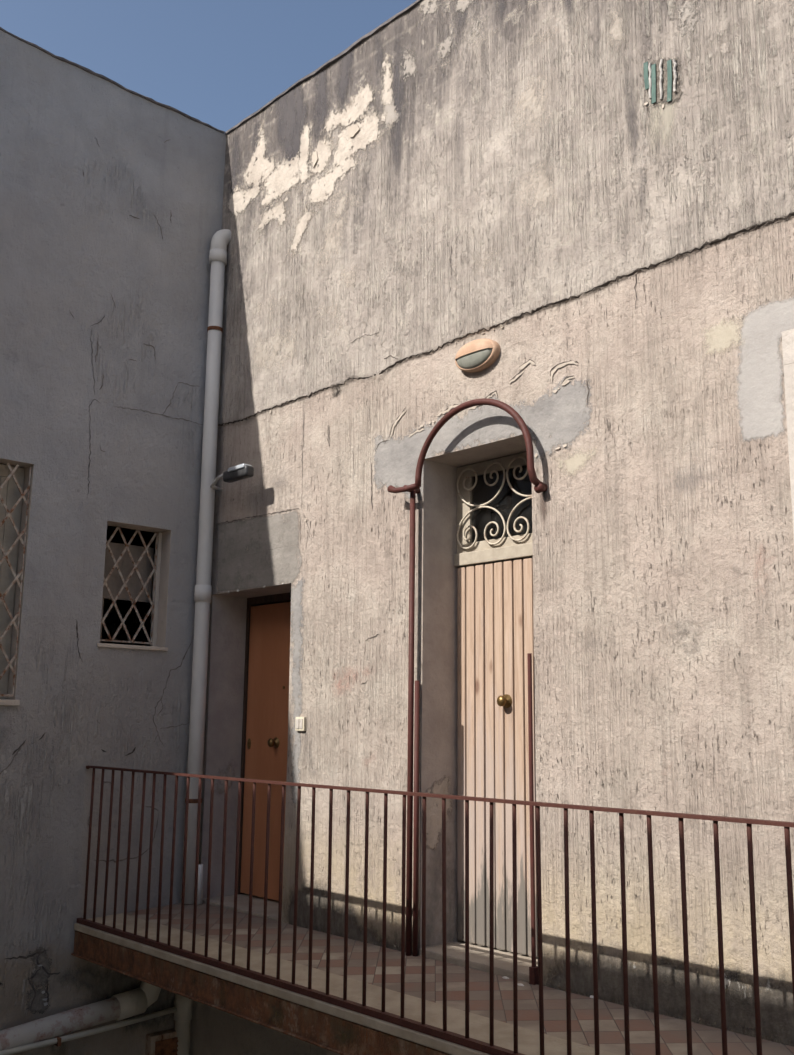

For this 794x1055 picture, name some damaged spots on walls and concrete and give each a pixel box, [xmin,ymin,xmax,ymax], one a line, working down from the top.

peeling [413,0,488,62]
leakage [376,38,404,167]
peeling [223,43,417,260]
peeling [253,330,295,368]
crack [69,212,794,544]
spalling [6,946,60,1014]
leakage [64,969,142,999]
leakage [124,988,174,1029]
leakage [543,952,794,1047]